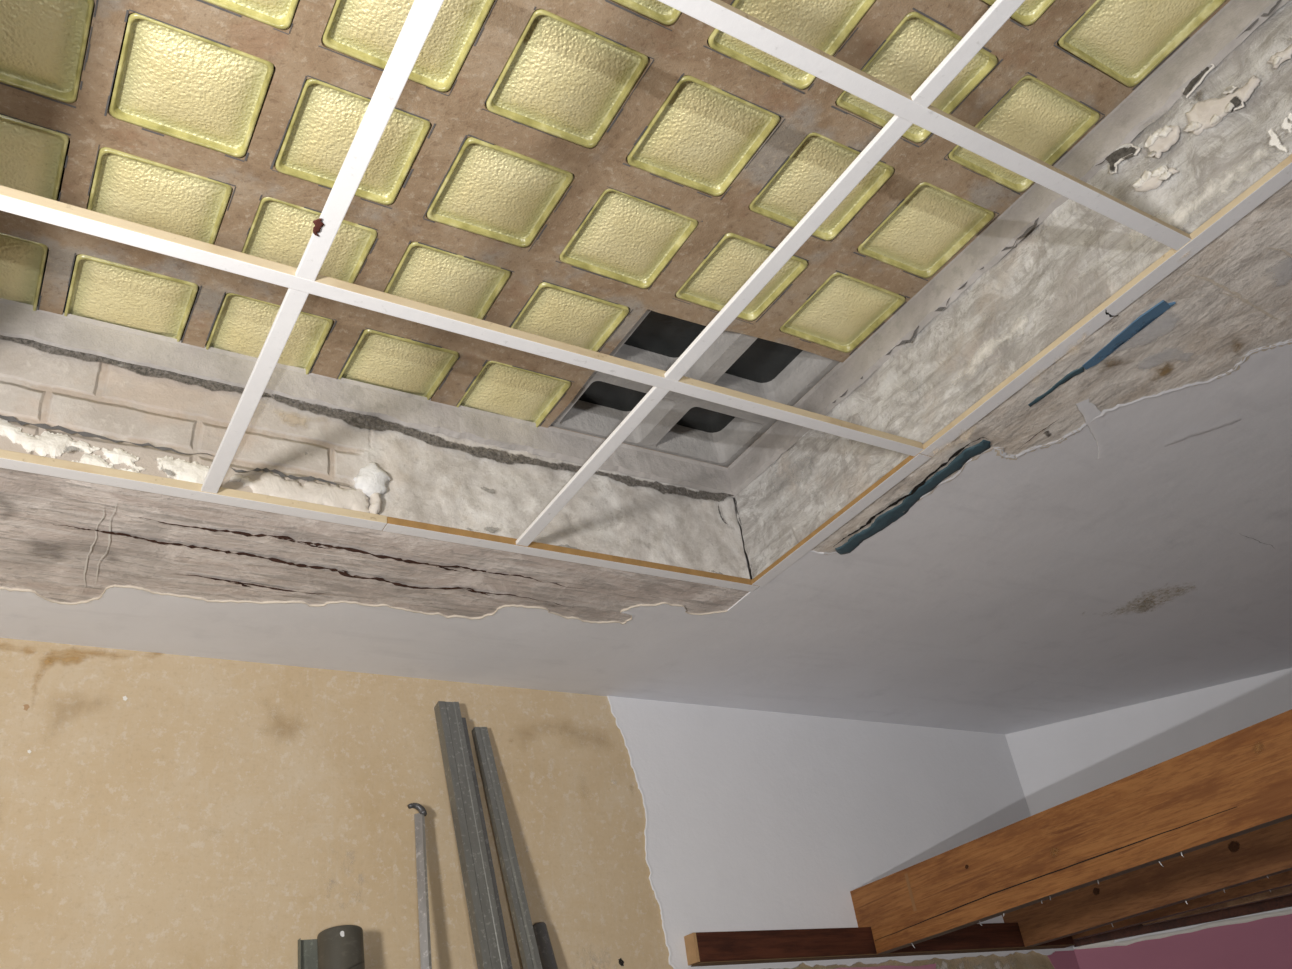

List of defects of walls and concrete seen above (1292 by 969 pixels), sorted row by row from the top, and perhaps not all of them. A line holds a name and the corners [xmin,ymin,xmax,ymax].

flaking render [1267,36,1292,69]
flaking render [1105,64,1261,192]
flaking render [812,180,1292,555]
crack [0,415,351,488]
crack [53,500,582,608]
flaking render [0,468,749,625]
peeling [607,696,683,969]
peeling [711,950,1055,969]